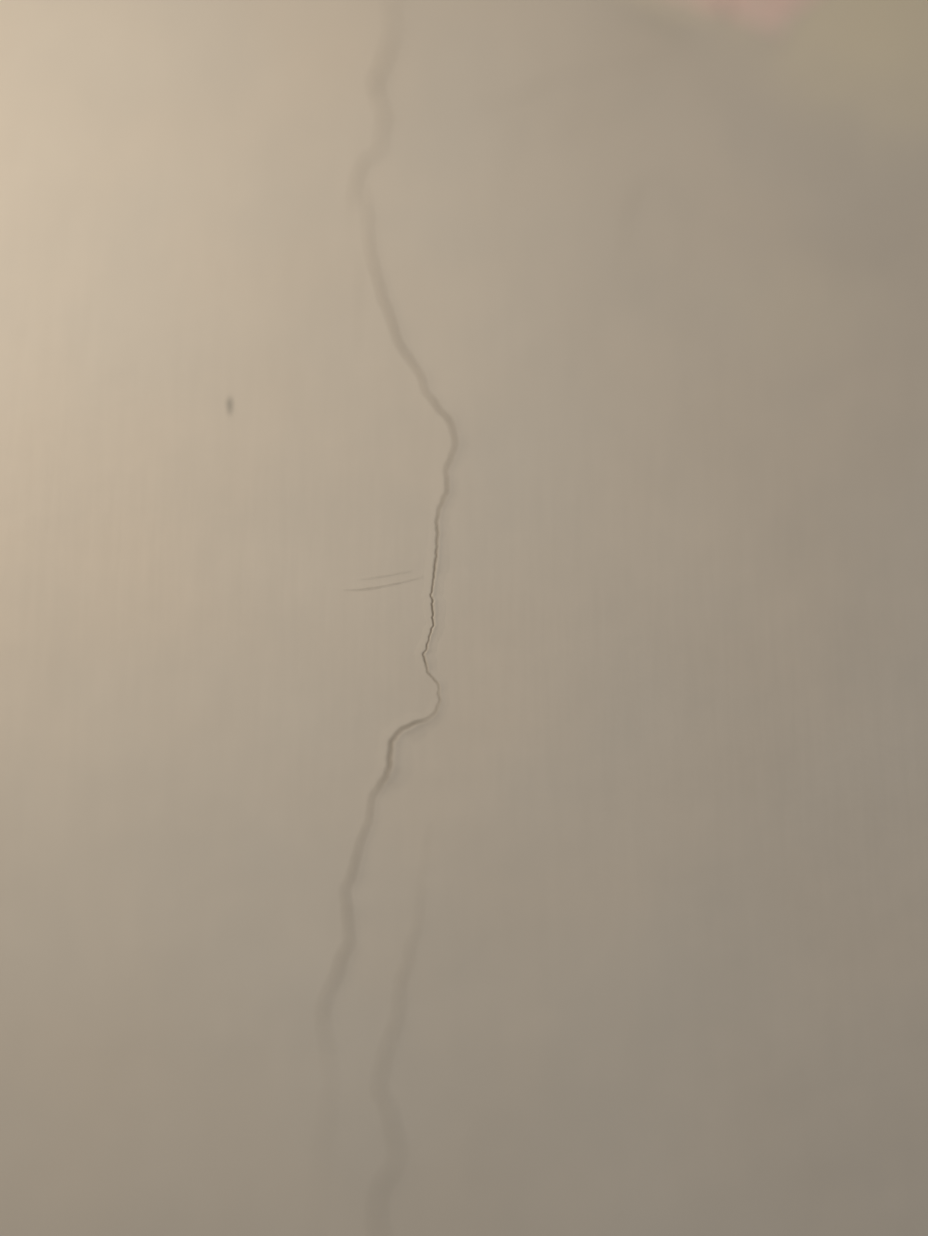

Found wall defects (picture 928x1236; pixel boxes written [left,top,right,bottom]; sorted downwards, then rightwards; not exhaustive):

crack [307,0,469,1236]